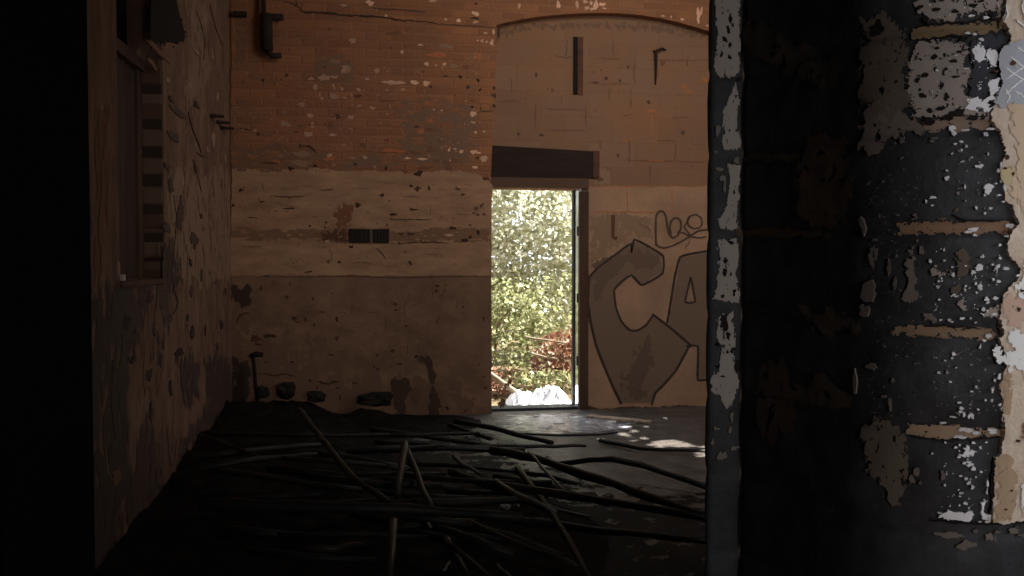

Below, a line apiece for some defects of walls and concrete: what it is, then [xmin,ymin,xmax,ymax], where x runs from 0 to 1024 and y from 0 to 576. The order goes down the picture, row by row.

crack [286,1,494,28]
peeling [913,0,1003,23]
peeling [856,10,1016,155]
peeling [702,0,741,460]
peeling [859,216,924,317]
leakage [231,303,512,415]
peeling [853,363,877,394]
peeling [860,395,922,507]
peeling [956,444,975,467]
peeling [932,498,1019,551]